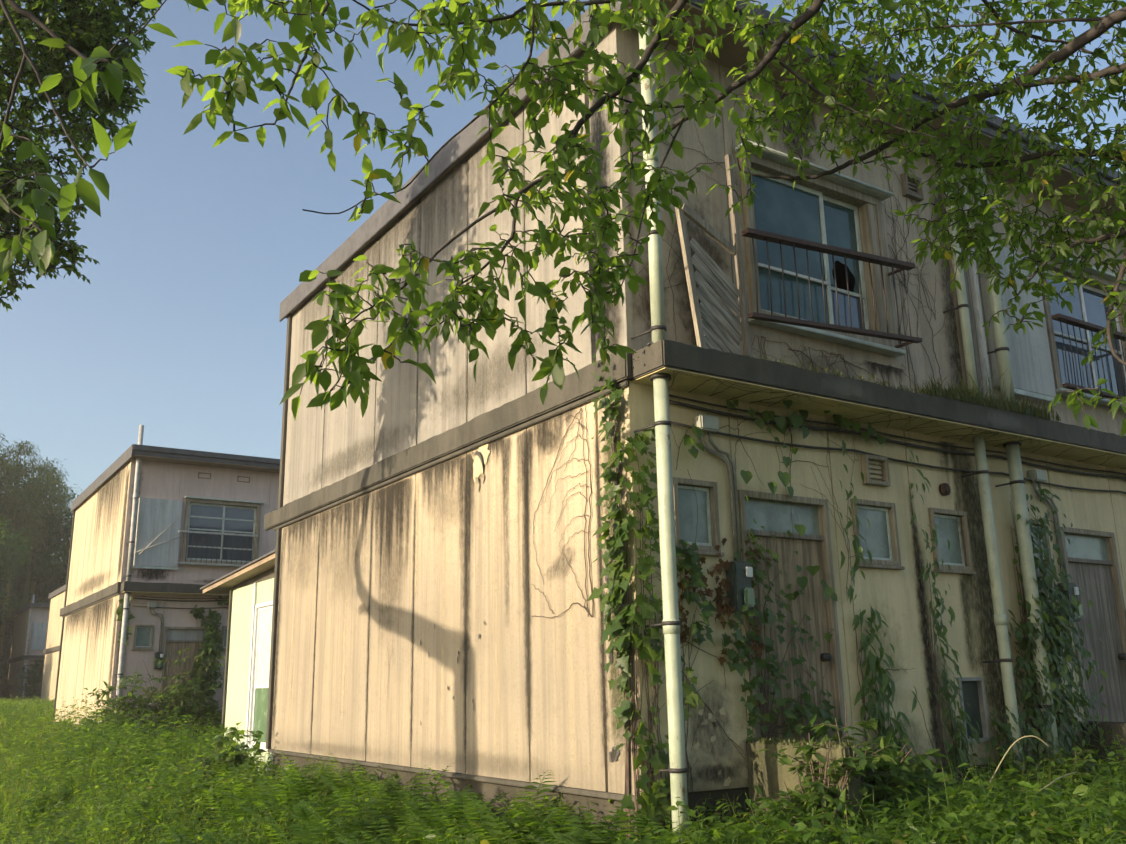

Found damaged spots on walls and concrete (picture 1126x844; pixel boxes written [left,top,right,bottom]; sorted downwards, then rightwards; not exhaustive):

damp [272,454,474,731]
damp [490,410,572,742]
damp [911,506,950,747]
damp [940,442,1007,723]